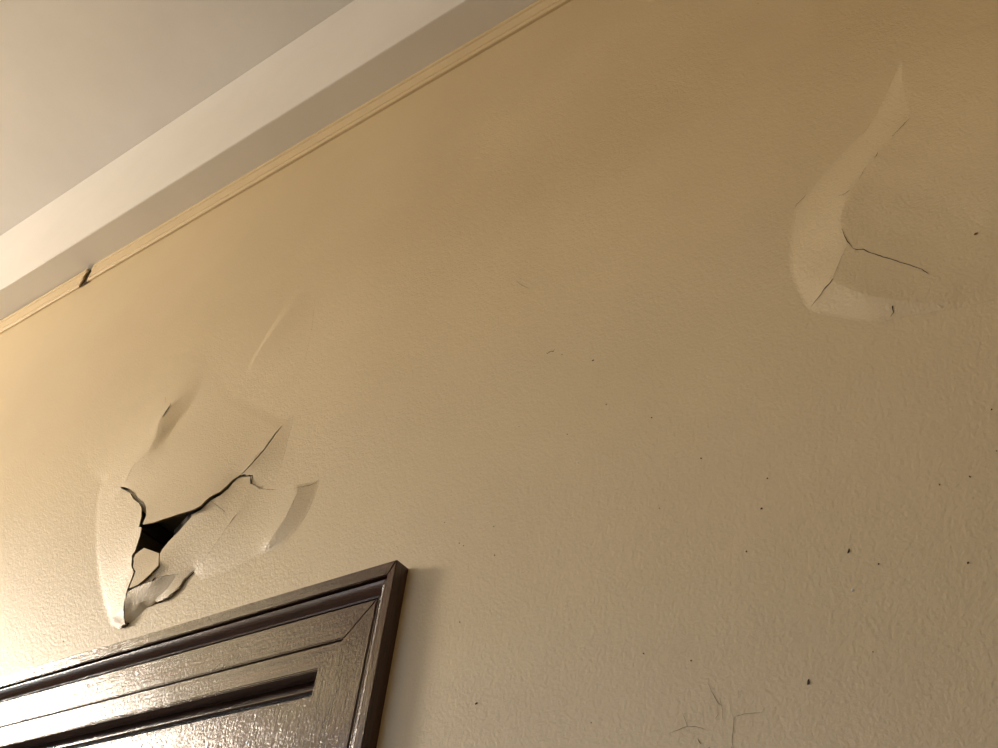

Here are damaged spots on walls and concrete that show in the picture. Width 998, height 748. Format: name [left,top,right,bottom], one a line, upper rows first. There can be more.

peeling [129,479,237,590]
crack [152,499,236,604]